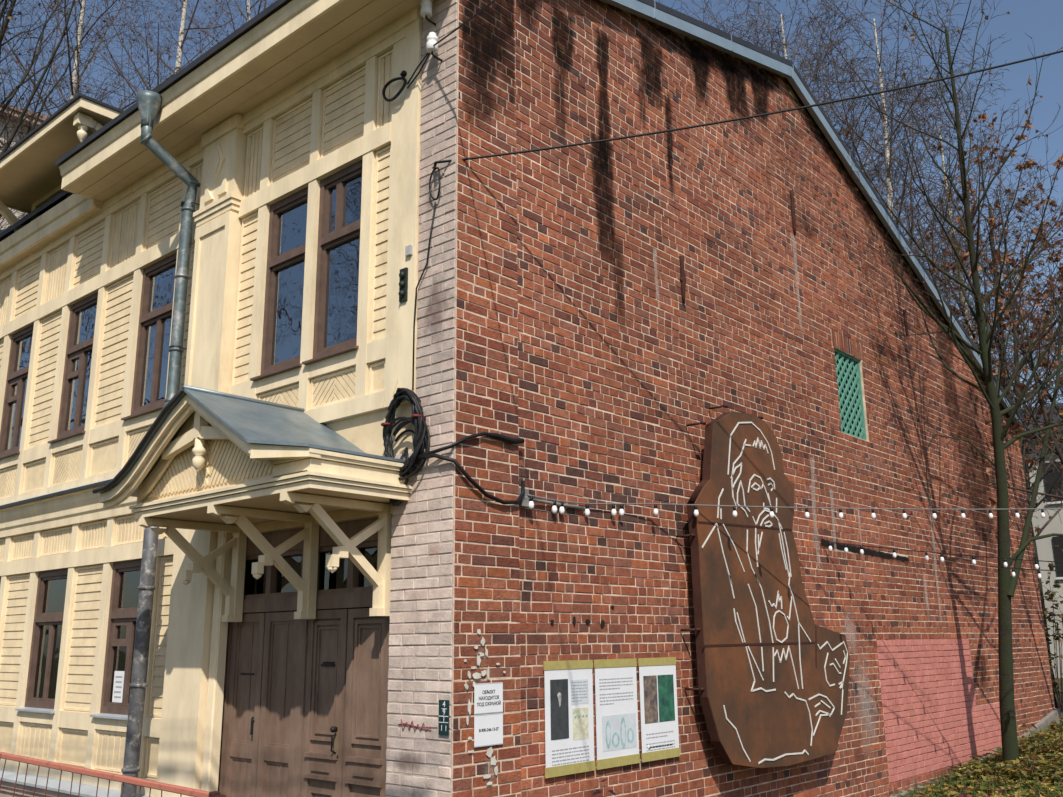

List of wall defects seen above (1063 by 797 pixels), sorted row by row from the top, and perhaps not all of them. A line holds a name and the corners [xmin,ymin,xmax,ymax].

leakage [462,0,539,119]
leakage [552,6,574,133]
leakage [591,29,623,313]
leakage [638,24,779,194]